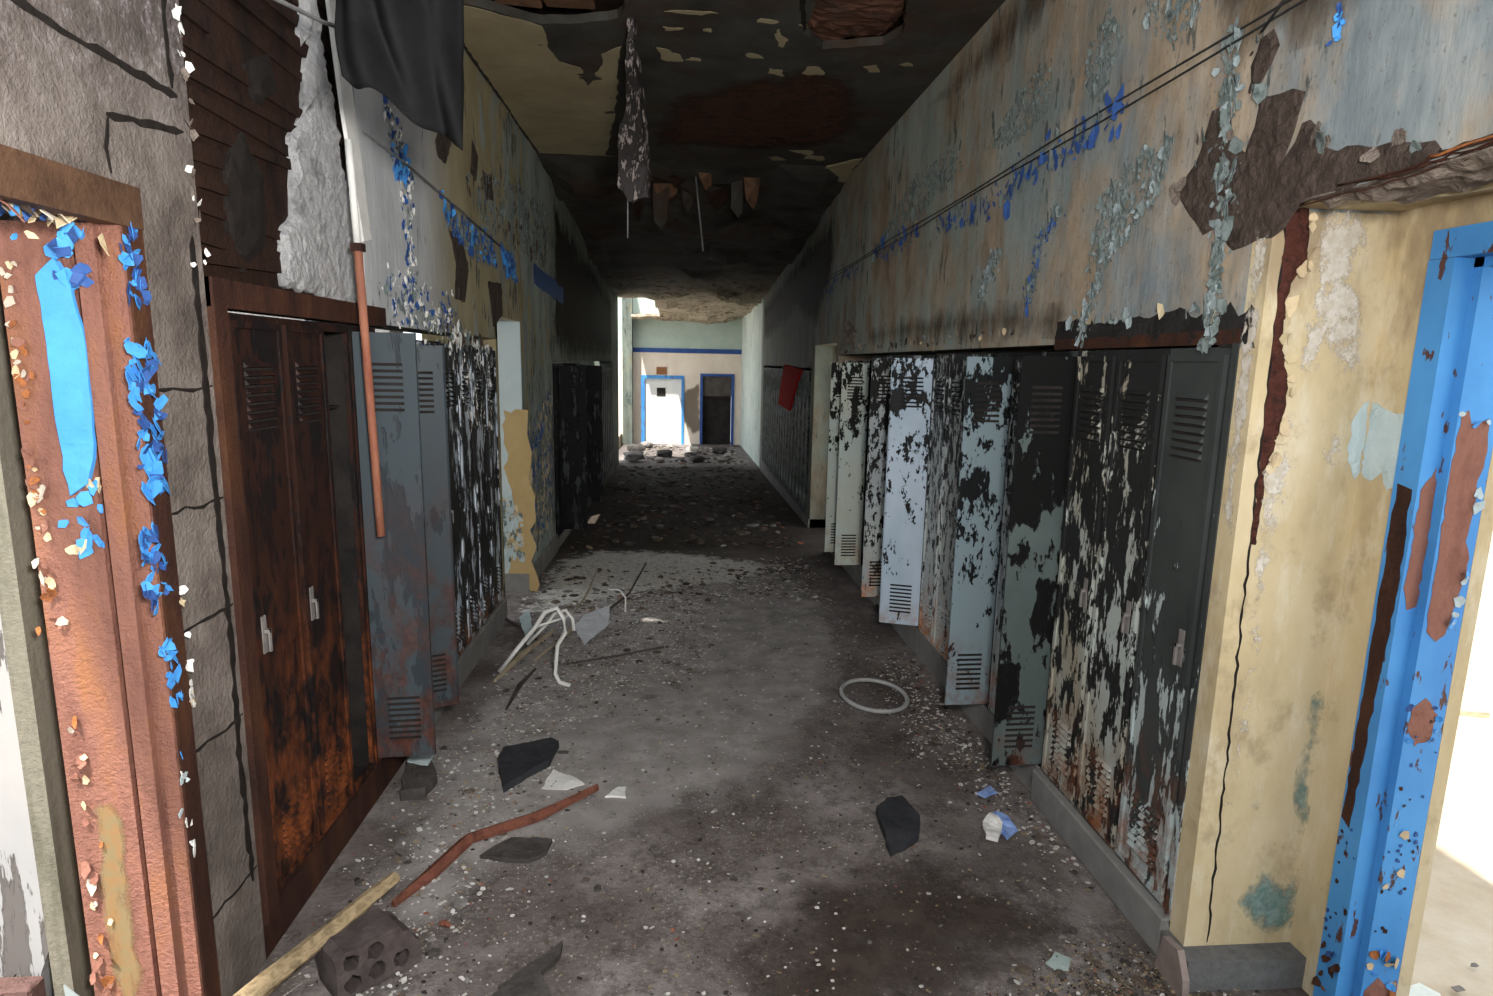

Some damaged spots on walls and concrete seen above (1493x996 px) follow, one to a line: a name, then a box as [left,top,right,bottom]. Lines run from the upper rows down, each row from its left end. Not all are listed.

crack [10,0,184,173]
flaking render [277,0,358,303]
peeling [870,6,1128,268]
peeling [1143,0,1202,51]
peeling [1326,2,1346,47]
peeling [840,203,1065,353]
crack [1206,228,1286,942]
rust [1341,483,1412,828]
rust [97,805,140,996]
leakage [1242,875,1294,928]
rust [1311,940,1340,991]
rust [1363,950,1399,996]